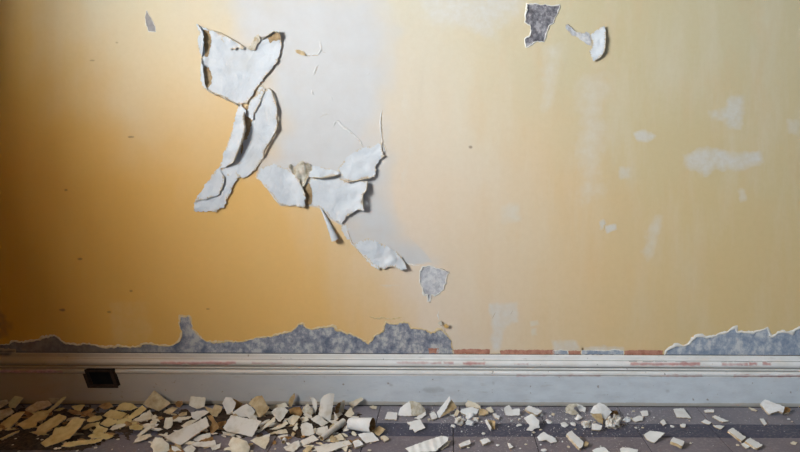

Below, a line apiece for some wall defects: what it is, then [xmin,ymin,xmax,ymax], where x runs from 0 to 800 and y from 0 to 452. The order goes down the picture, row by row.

flaking render [145,10,156,32]
flaking render [524,3,560,48]
peeling [565,24,606,61]
peeling [194,0,452,302]
flaking render [0,311,453,366]
flaking render [581,325,800,378]